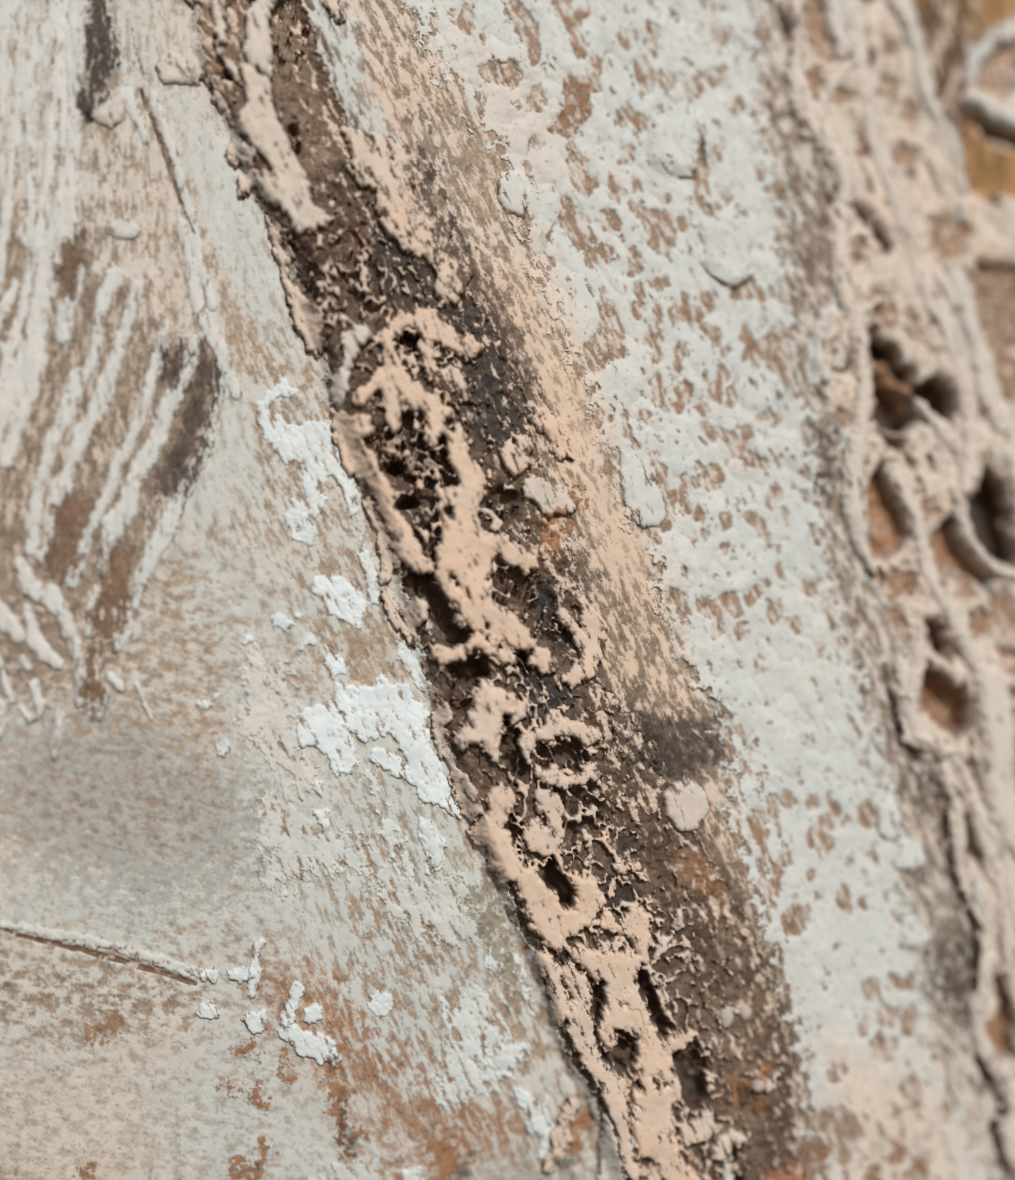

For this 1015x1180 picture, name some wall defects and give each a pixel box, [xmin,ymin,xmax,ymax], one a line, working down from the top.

spalling [185,0,989,1180]